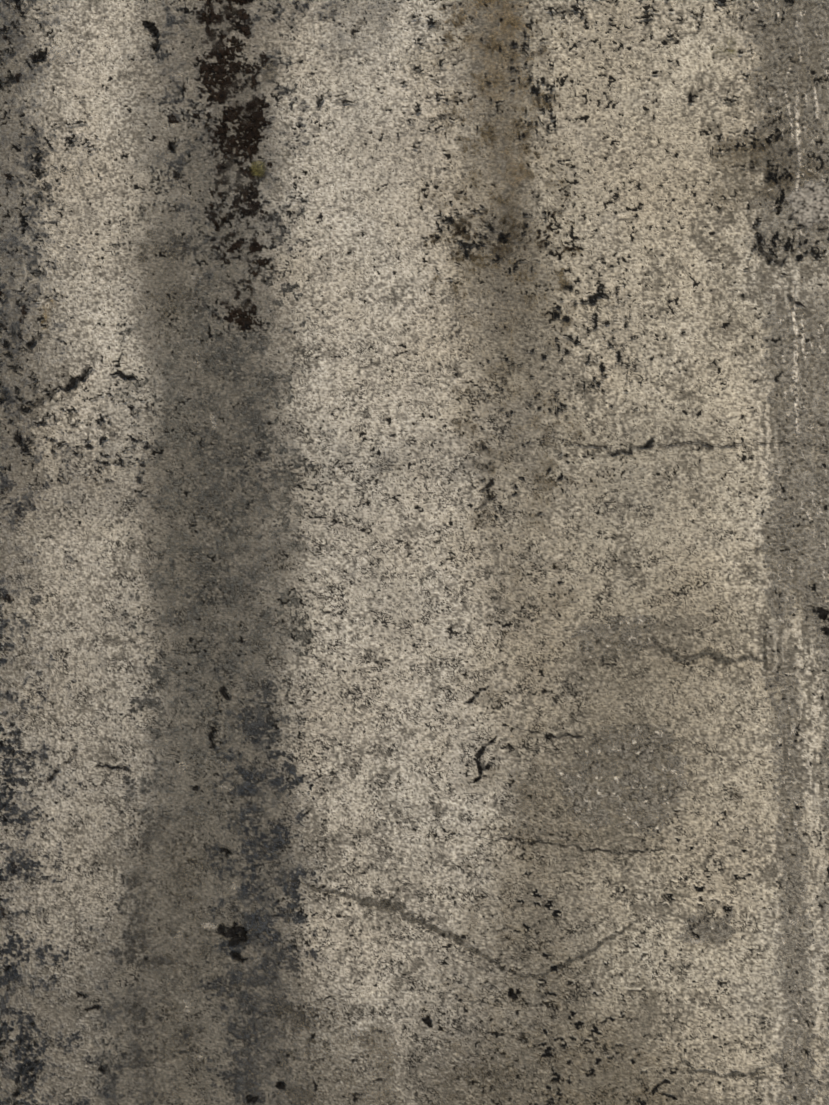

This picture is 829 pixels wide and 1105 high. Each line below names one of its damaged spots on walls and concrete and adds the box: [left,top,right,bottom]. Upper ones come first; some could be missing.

leakage [439,95,495,153]
leakage [514,94,558,178]
leakage [785,93,801,162]
leakage [0,0,80,367]
leakage [424,163,594,343]
leakage [792,295,805,433]
crack [565,437,791,456]
leakage [0,466,49,529]
leakage [87,0,402,1105]
leakage [0,575,49,666]
leakage [0,647,81,1105]